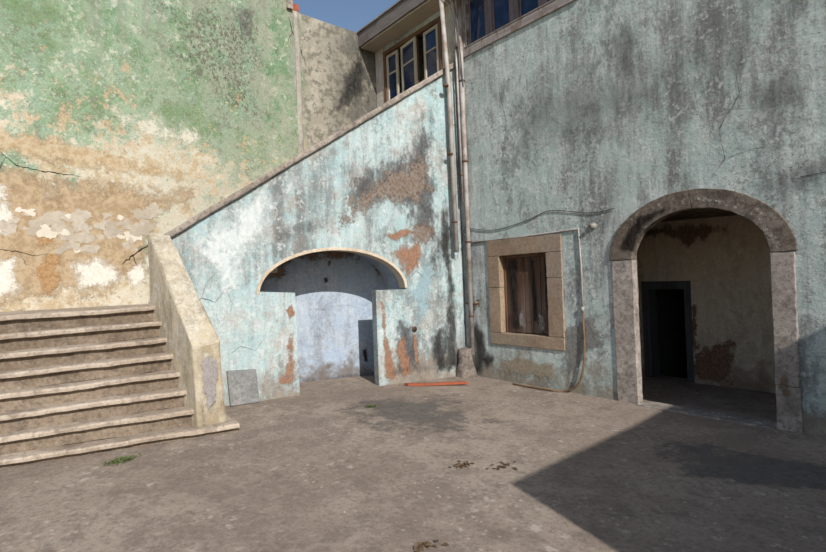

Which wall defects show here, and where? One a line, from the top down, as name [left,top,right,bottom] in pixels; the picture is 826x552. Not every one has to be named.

crack [0,155,81,177]
crack [709,67,769,181]
peeling [0,168,194,306]
peeling [385,222,436,276]
leakage [433,210,458,370]
peeling [691,304,736,386]